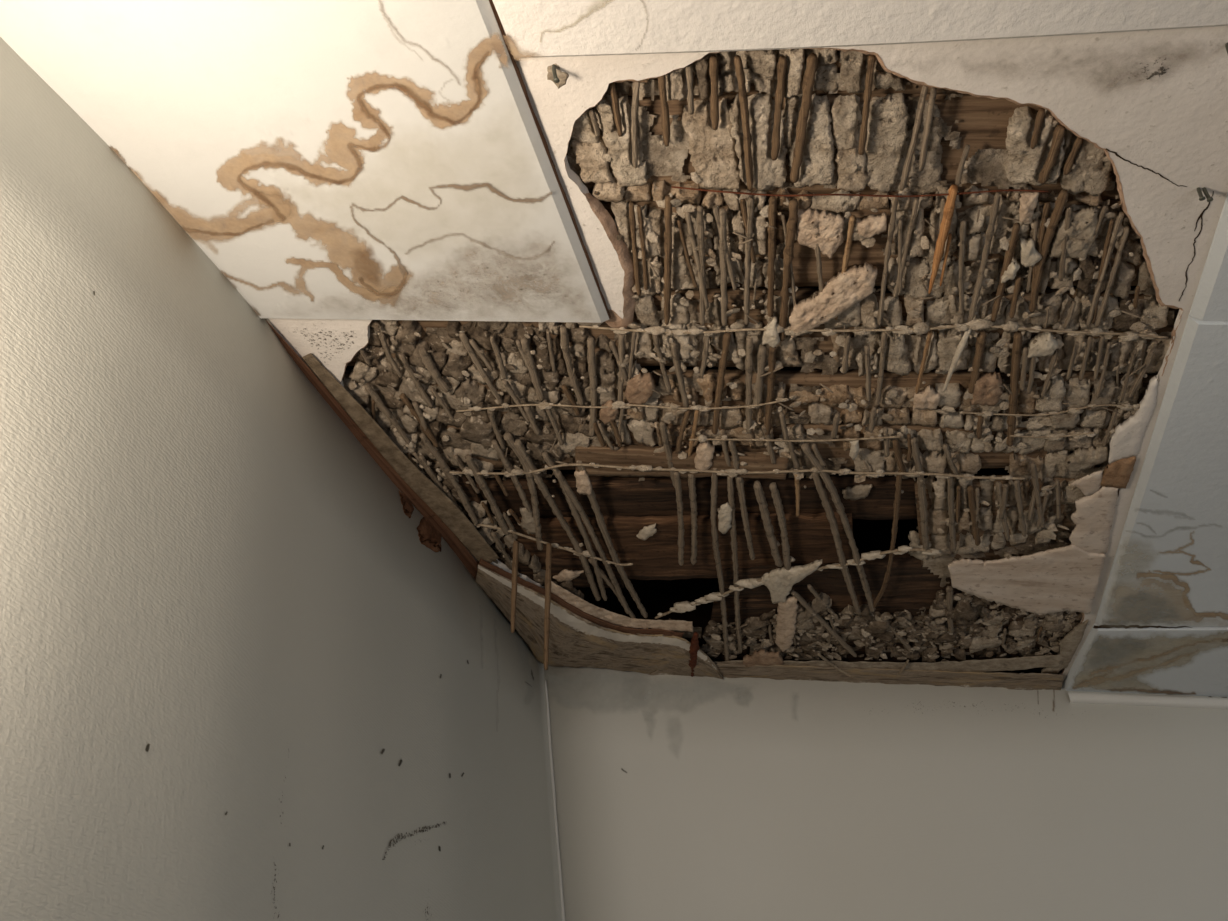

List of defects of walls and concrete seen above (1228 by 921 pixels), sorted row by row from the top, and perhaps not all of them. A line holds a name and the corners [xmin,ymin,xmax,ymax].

water stain [110,34,552,306]
water stain [412,245,568,310]
spalling [340,48,1183,663]
crack [1106,148,1214,301]
water stain [1073,537,1228,694]